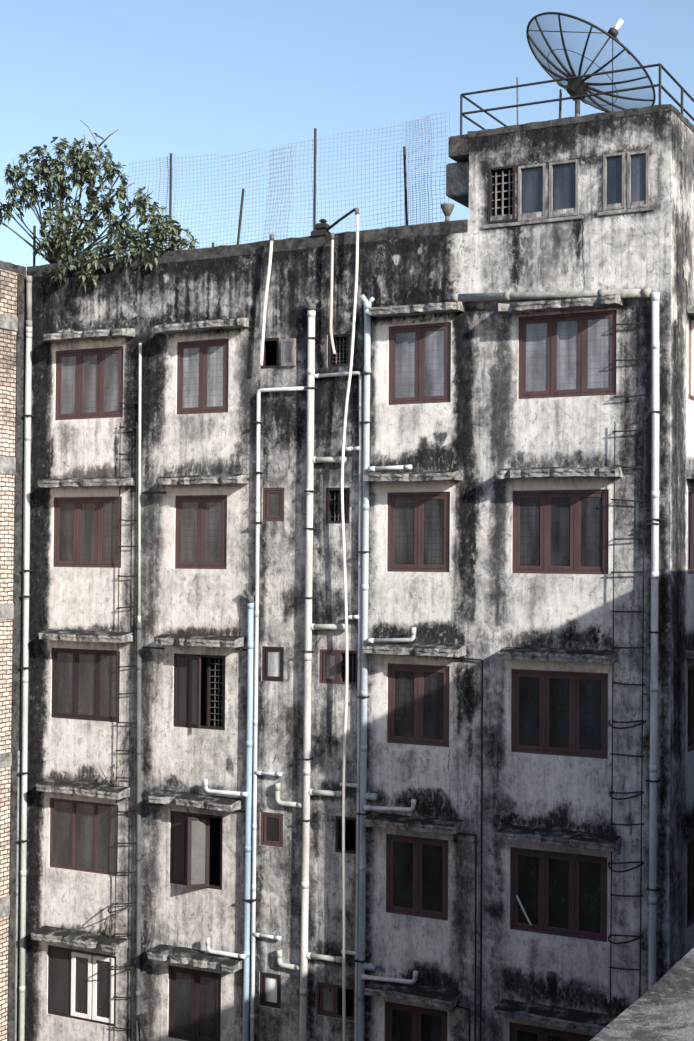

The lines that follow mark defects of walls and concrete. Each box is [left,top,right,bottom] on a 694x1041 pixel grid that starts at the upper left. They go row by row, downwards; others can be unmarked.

leakage [25,224,507,1041]
leakage [500,967,628,1016]
leakage [468,111,694,916]